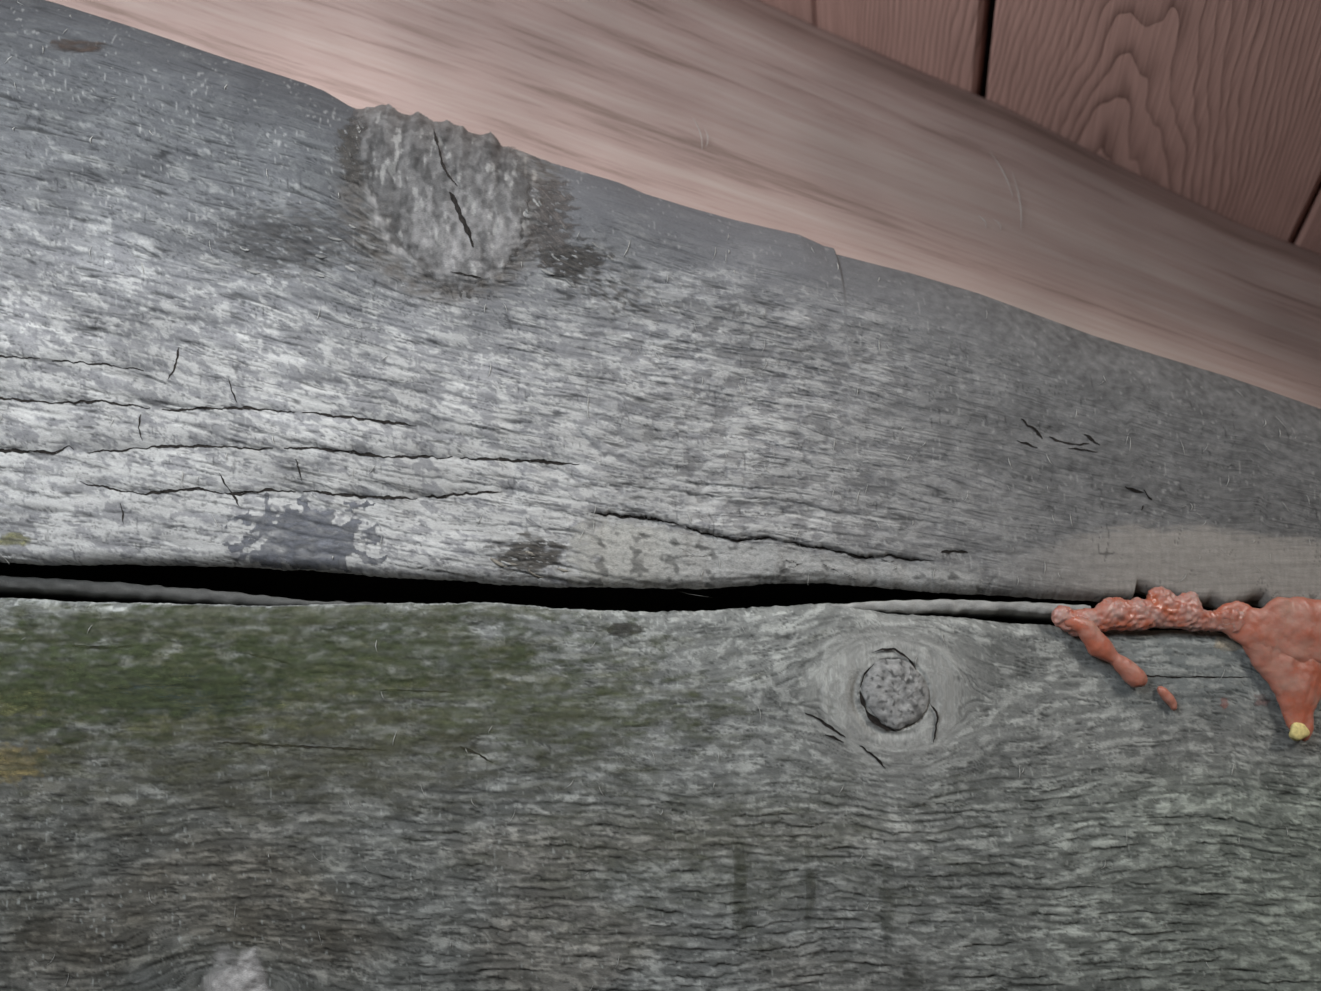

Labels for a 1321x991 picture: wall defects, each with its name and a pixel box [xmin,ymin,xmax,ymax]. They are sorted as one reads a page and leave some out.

damp [222,492,387,573]
crack [591,512,968,579]